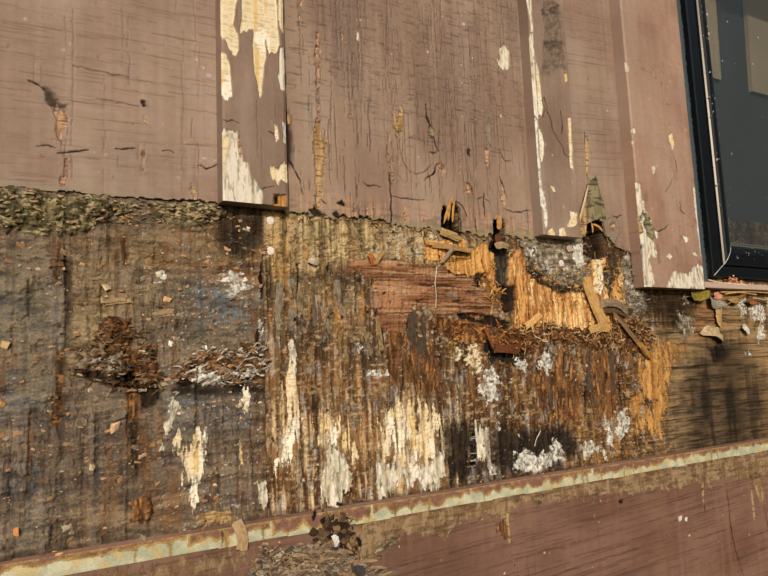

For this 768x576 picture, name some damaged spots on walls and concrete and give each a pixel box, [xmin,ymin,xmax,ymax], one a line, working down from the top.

peeling [220,0,285,100]
peeling [497,45,509,70]
peeling [222,128,263,204]
peeling [270,162,287,207]
crack [269,112,326,204]
crack [363,175,415,225]
crack [424,104,439,181]
spalling [483,182,672,366]
peeling [667,187,704,289]
water stain [738,298,768,344]
corrosion [245,440,768,544]
corrosion [0,527,235,575]